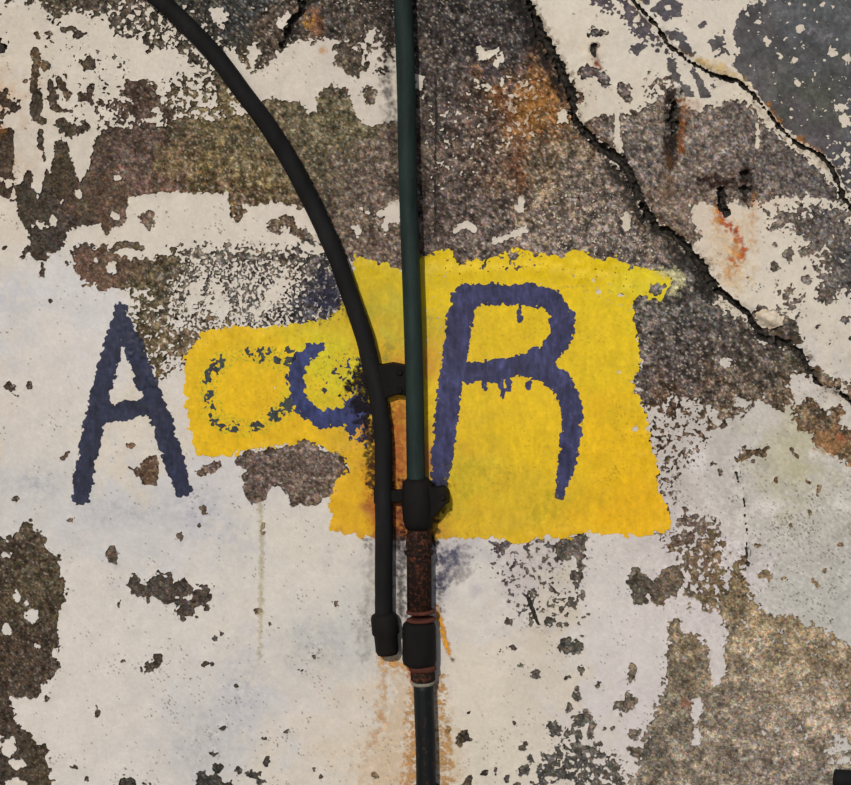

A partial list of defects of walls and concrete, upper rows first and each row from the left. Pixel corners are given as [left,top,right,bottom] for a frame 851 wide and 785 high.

spalling [174,0,396,79]
spalling [0,0,343,380]
spalling [262,83,402,270]
crack [519,0,851,405]
corrosion [696,166,751,190]
corrosion [715,205,747,262]
spalling [412,0,851,785]
spalling [235,438,350,507]
peeling [0,518,69,785]
peeling [126,569,215,622]
corrosion [406,604,453,661]
peeling [196,752,271,785]